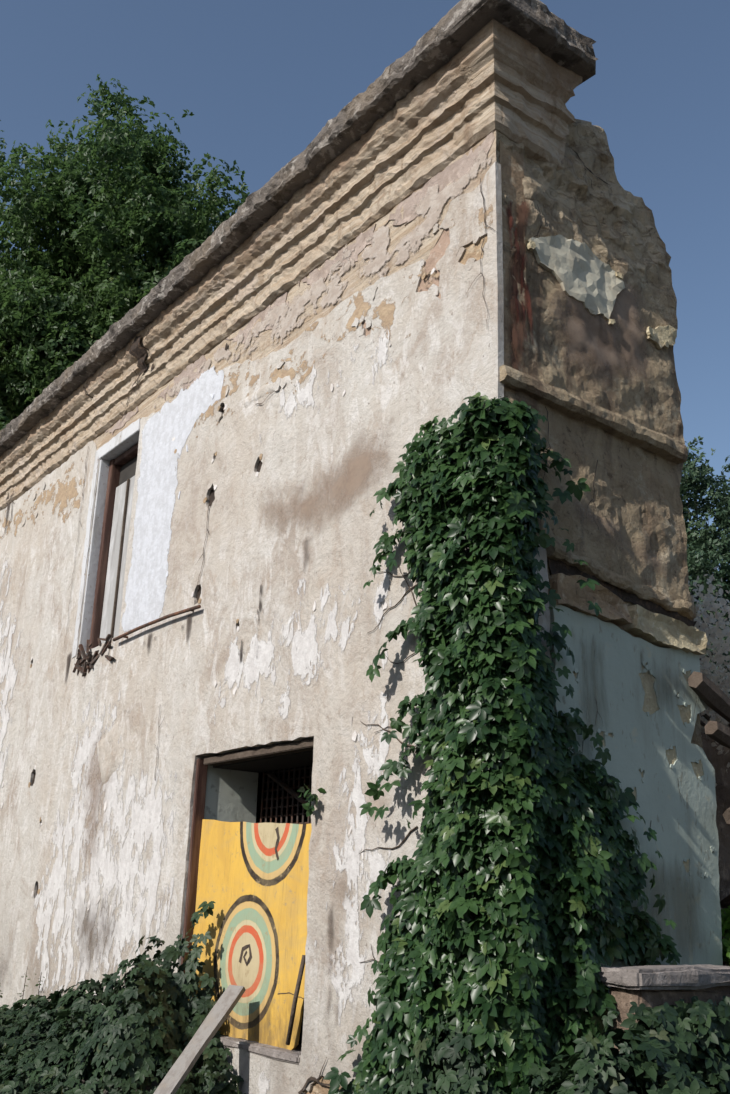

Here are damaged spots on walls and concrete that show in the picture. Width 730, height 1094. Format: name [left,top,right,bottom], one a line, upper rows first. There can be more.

rust [507,201,533,370]
flaking render [93,130,496,632]
leakage [269,449,384,524]
peeling [213,562,407,724]
peeling [327,691,391,1026]